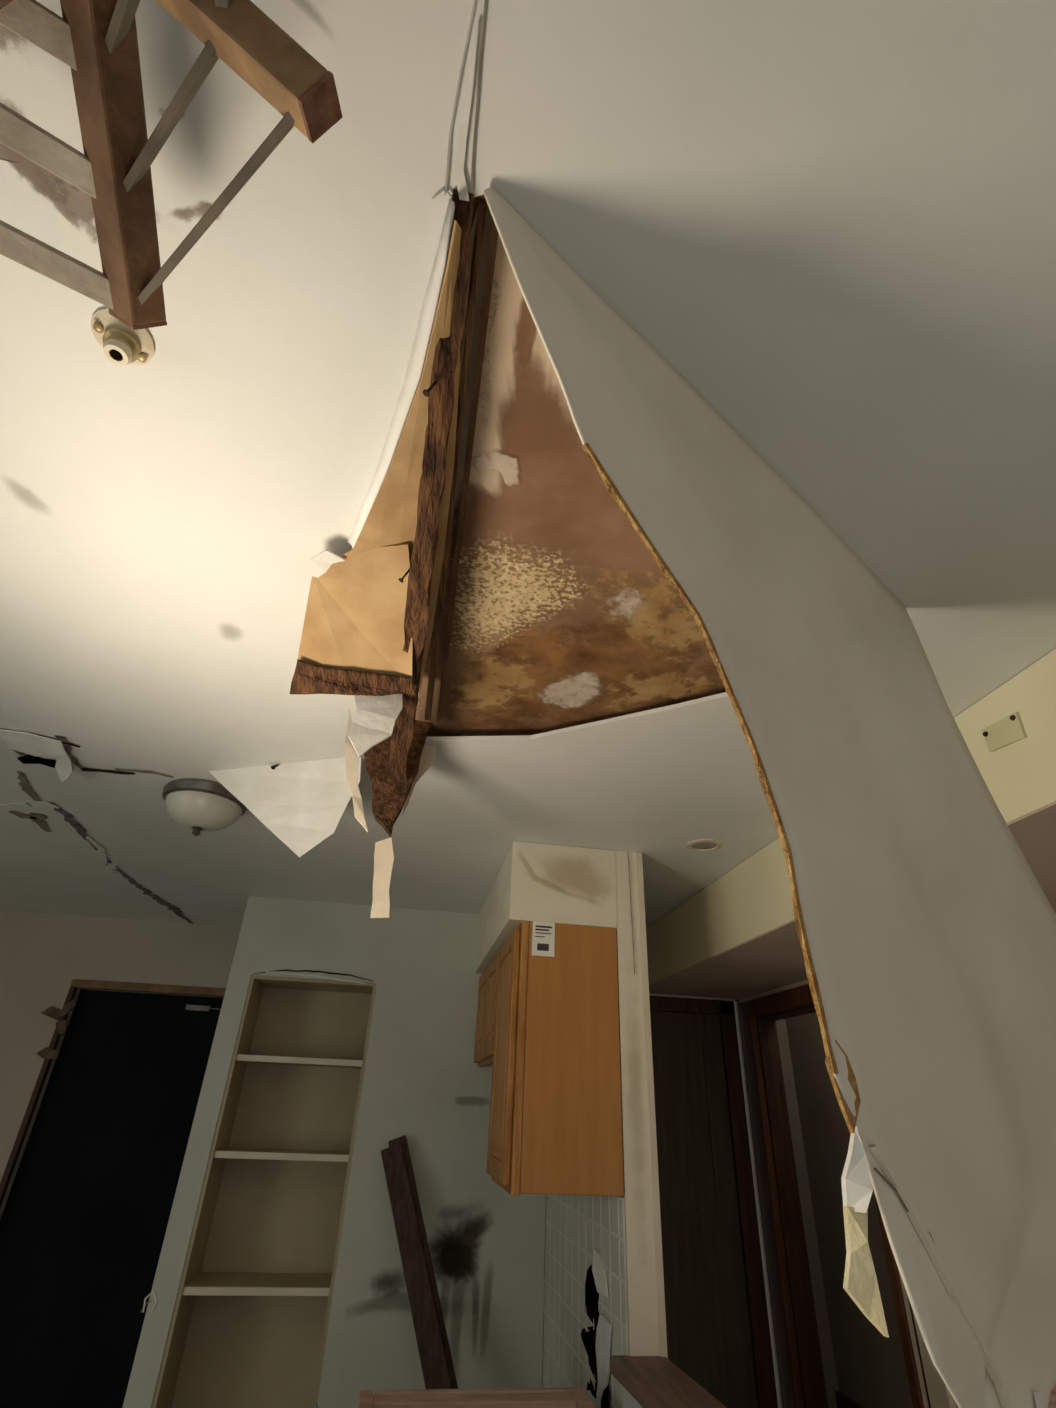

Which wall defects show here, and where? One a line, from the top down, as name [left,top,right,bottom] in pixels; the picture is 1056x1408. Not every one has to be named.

damp [0,143,97,242]
damp [173,204,218,221]
crack [432,0,486,201]
damp [290,299,726,737]
crack [0,729,193,924]
damp [430,1219,485,1278]
spalling [581,1248,612,1408]
peeling [825,1039,889,1337]